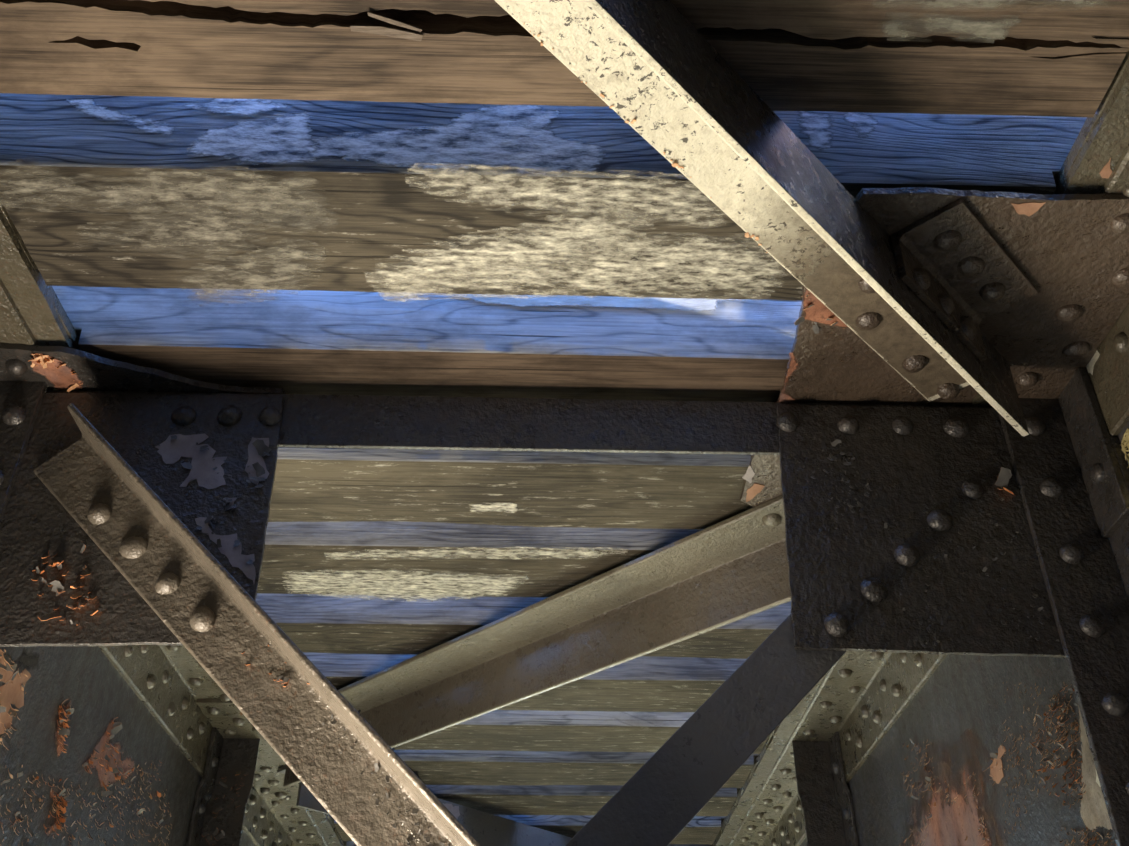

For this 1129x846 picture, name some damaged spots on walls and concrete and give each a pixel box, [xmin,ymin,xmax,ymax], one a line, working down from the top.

crack [1093,34,1129,42]
water stain [0,98,967,399]
rust [31,353,81,391]
peeling [155,433,237,511]
peeling [244,437,272,488]
peeling [195,515,256,583]
rust [55,699,74,757]
rust [83,717,135,791]
rust [47,788,70,835]
rust [899,739,1002,846]